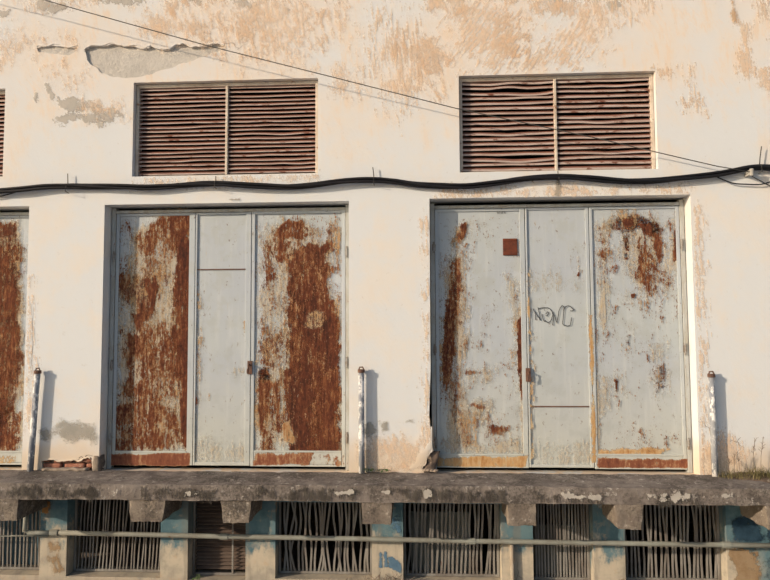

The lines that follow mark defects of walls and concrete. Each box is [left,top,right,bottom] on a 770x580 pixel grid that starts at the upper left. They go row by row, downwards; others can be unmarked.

spalling [0,0,351,78]
peeling [356,0,654,116]
peeling [735,21,770,90]
peeling [57,96,124,128]
corrosion [0,219,27,463]
corrosion [111,208,206,466]
corrosion [250,213,346,466]
corrosion [435,206,688,468]
spalling [41,456,92,472]
water stain [40,420,95,441]
peeling [729,516,770,580]